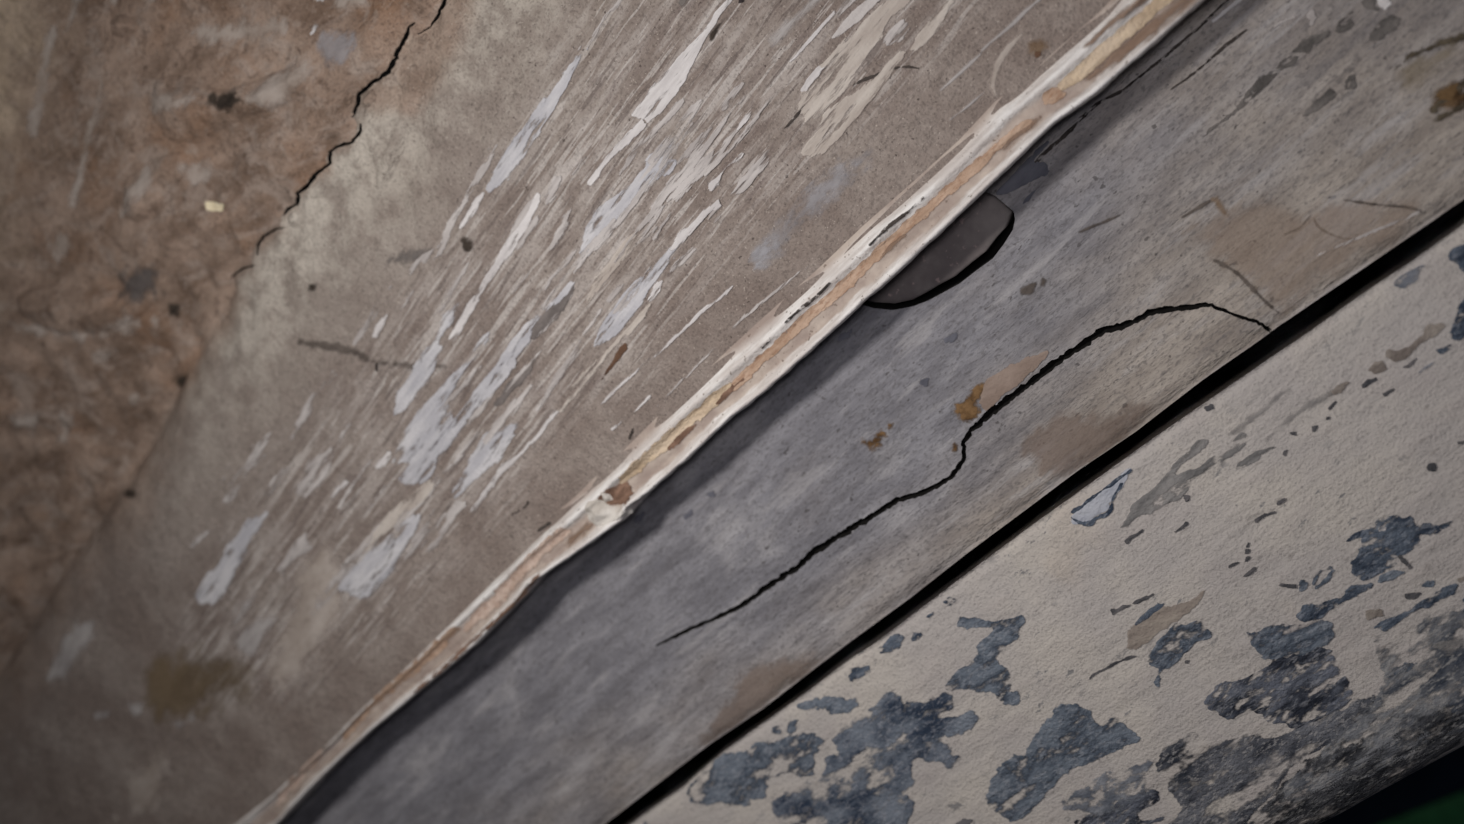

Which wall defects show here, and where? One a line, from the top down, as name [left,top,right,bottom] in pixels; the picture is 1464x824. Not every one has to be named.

crack [231,0,447,277]
spalling [342,0,1212,740]
crack [869,197,924,246]
crack [658,260,1278,645]
corrosion [955,383,985,422]
peeling [1071,300,1464,544]
peeling [1394,265,1424,289]
peeling [1448,244,1464,272]
peeling [686,597,1025,824]
peeling [986,515,1464,824]